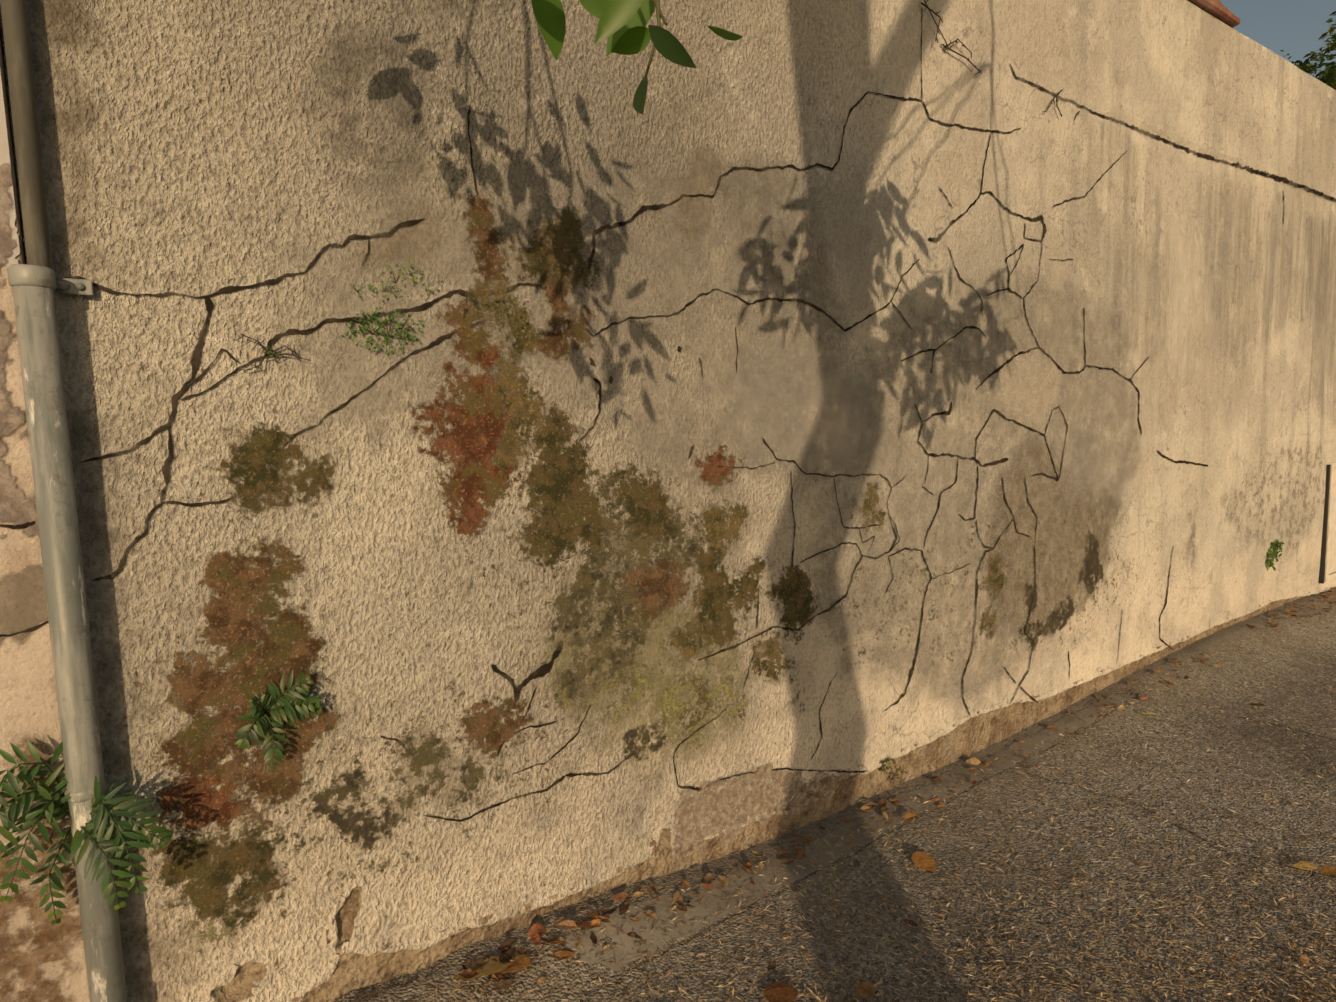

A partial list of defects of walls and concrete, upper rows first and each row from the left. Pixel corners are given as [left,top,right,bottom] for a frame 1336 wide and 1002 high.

spalling [0,164,17,286]
crack [0,521,35,529]
spalling [0,311,40,539]
crack [0,620,49,637]
leakage [323,176,567,411]
crack [424,642,632,822]
leakage [463,458,750,722]
leakage [538,151,833,465]
crack [66,13,1336,791]
leakage [816,284,1134,697]